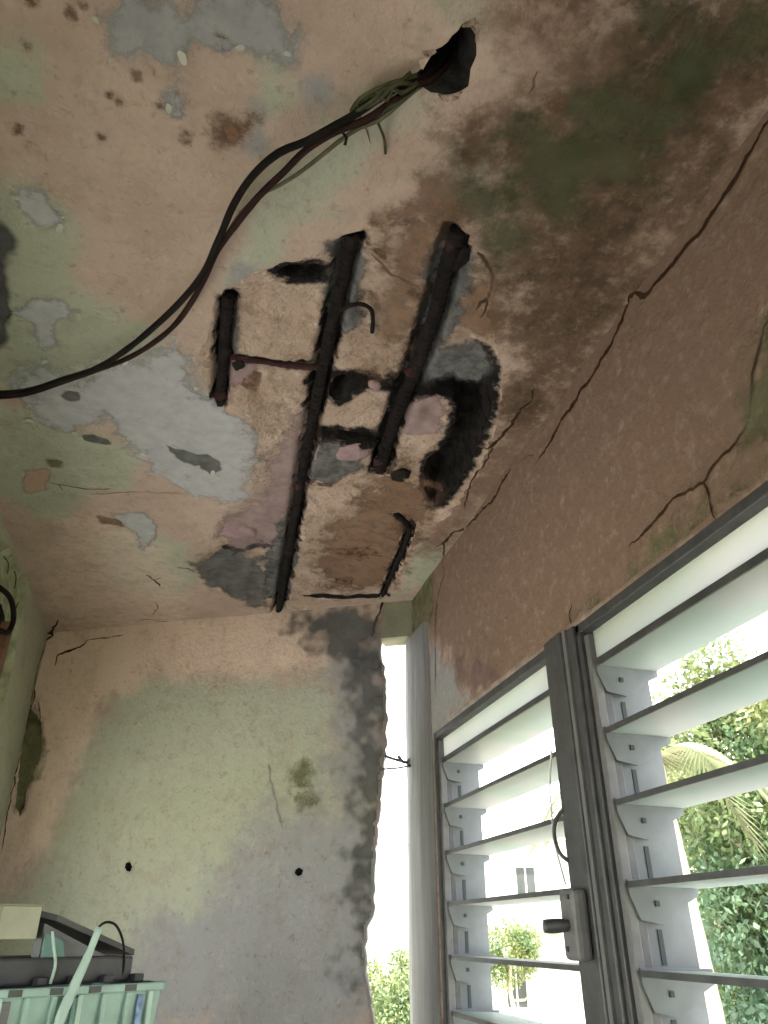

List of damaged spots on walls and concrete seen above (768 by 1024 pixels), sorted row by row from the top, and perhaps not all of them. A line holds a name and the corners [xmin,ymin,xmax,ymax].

peeling [92,0,301,66]
peeling [11,188,64,233]
damp [419,0,768,382]
damp [323,235,367,333]
spalling [6,209,504,613]
rust [215,405,332,550]
damp [309,441,363,484]
rust [313,460,436,592]
rust [404,397,445,435]
crack [435,120,768,691]
crack [1,620,122,853]
damp [289,604,384,961]